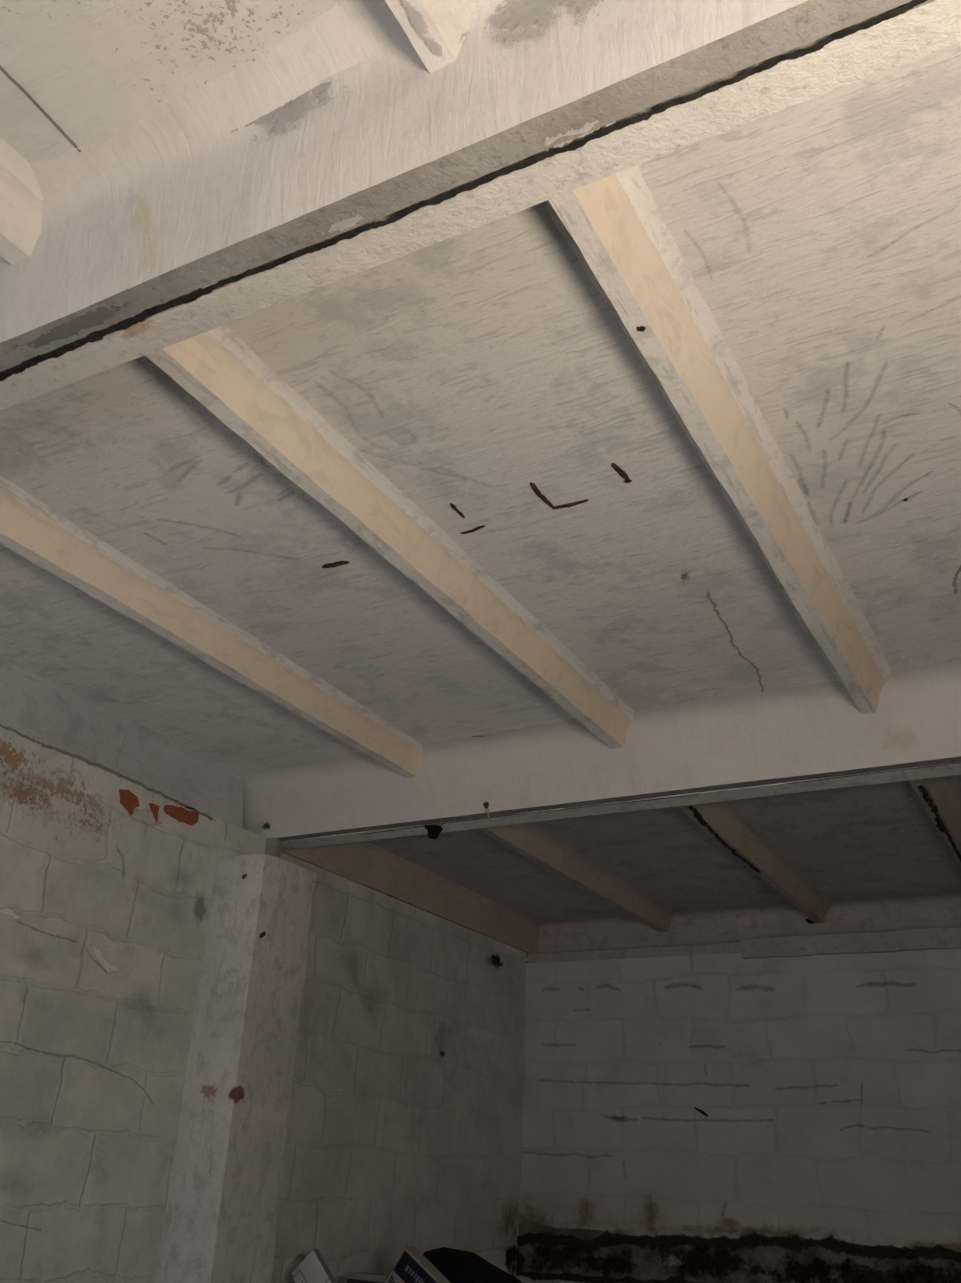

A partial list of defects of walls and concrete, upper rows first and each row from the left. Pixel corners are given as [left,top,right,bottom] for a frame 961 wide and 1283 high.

peeling [233,80,337,141]
crack [0,0,927,381]
crack [707,591,764,692]
peeling [0,735,201,841]
leakage [502,1205,961,1283]